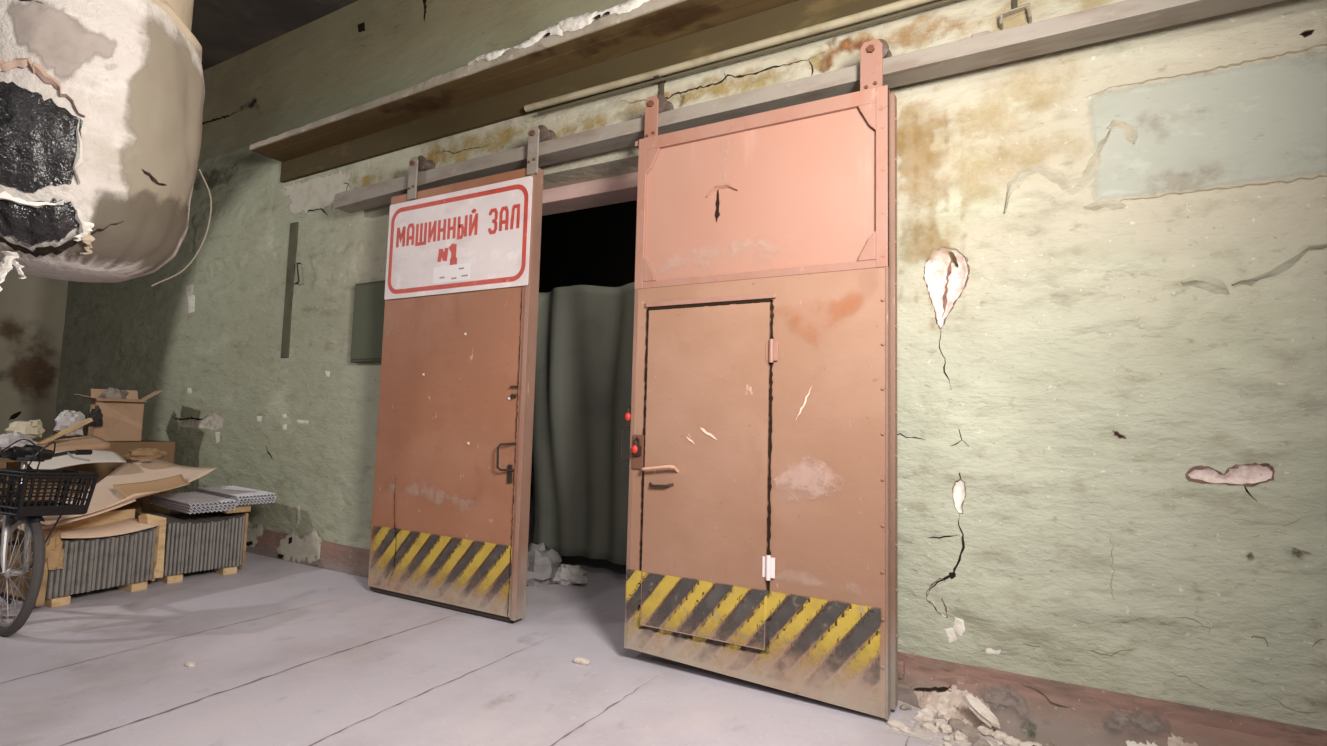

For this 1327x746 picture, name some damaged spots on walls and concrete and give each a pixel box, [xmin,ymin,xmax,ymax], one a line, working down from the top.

peeling [8,0,116,78]
crack [628,52,824,104]
crack [202,109,240,125]
flaking render [923,246,970,390]
flaking render [1185,462,1275,501]
crack [897,430,1040,655]
crack [1088,539,1210,656]
spalling [913,684,991,727]
spalling [1126,733,1198,746]